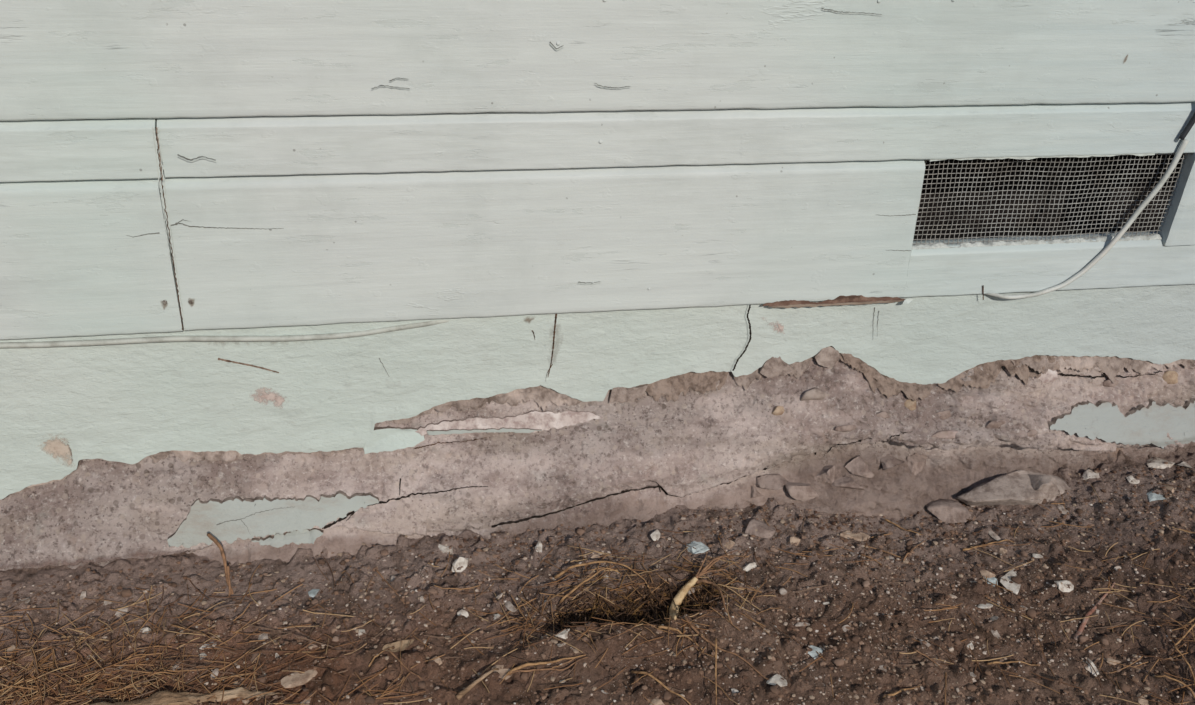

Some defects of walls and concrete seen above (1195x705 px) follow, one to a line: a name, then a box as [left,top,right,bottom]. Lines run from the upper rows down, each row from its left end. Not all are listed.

crack [532,314,557,377]
crack [731,305,752,371]
crack [415,437,487,449]
spalling [0,346,1195,571]
crack [815,432,908,455]
crack [322,478,488,529]
crack [492,465,773,528]